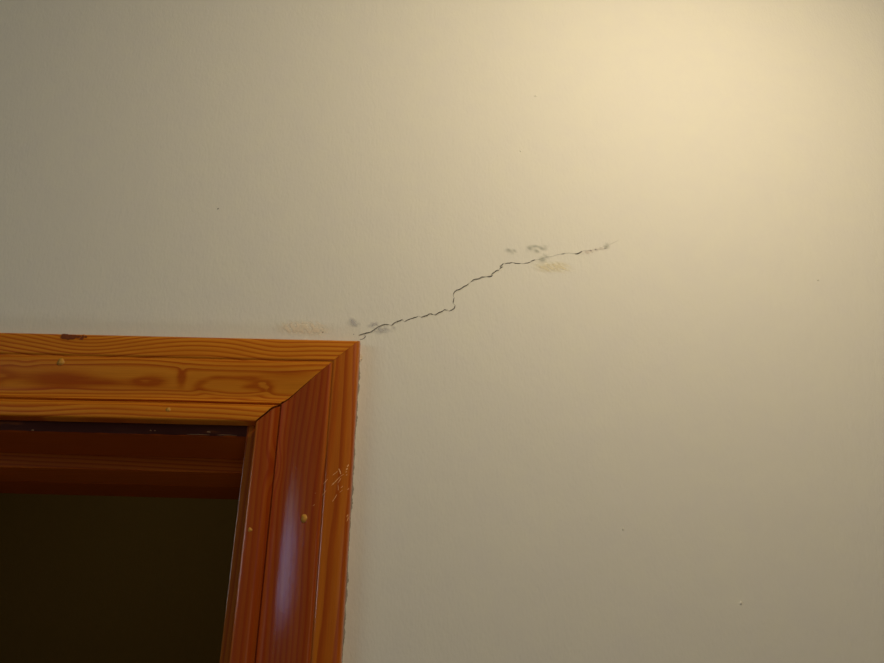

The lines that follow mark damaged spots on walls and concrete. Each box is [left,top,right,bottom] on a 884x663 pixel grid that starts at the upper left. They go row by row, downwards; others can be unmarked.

crack [359,241,616,340]